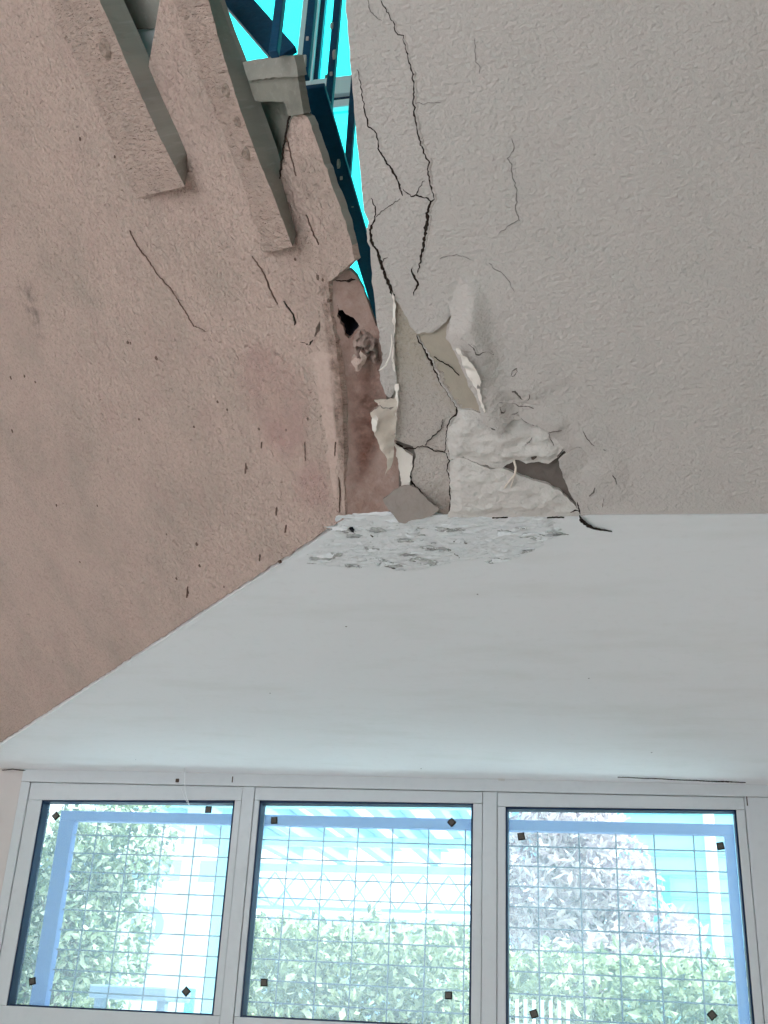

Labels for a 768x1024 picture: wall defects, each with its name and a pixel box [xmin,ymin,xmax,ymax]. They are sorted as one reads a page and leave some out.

crack [336,0,514,296]
crack [500,141,520,232]
crack [130,231,208,333]
crack [252,256,313,345]
water stain [358,394,378,469]
crack [395,334,459,511]
peeling [307,293,570,571]
crack [547,502,612,532]